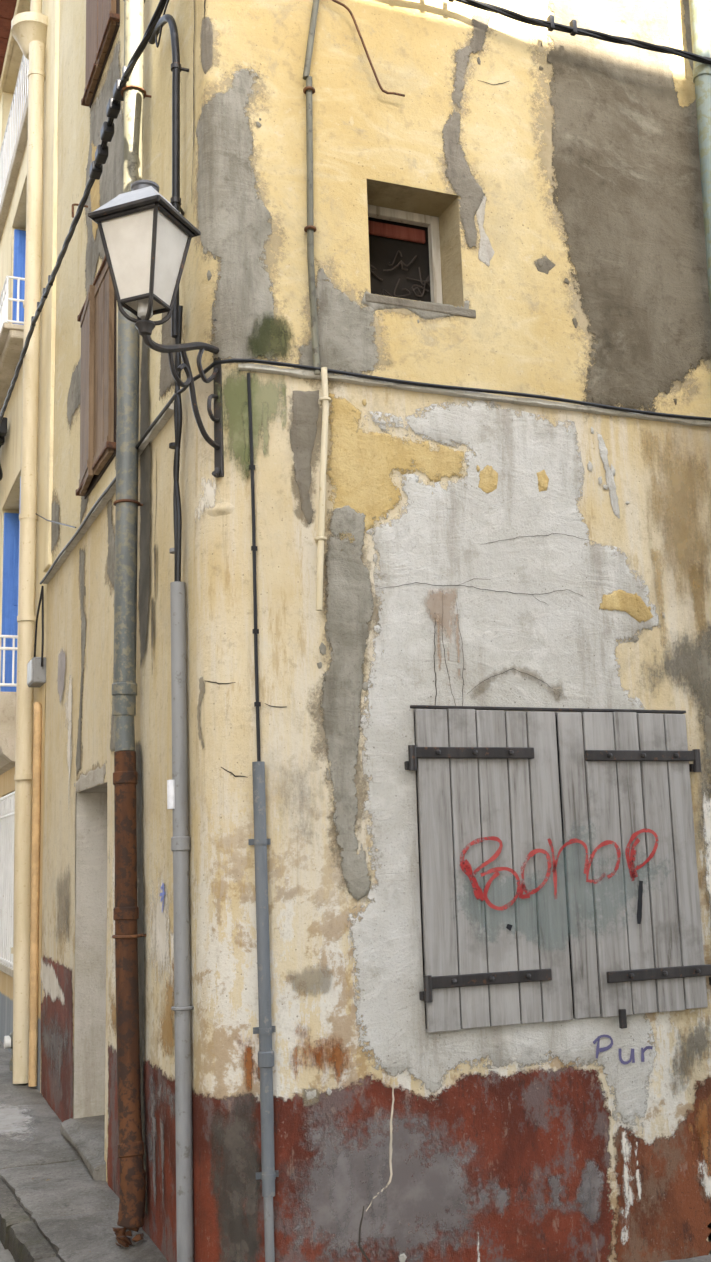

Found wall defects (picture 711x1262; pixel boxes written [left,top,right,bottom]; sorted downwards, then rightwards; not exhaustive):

peeling [86,140,100,240]
peeling [531,0,711,412]
damp [242,384,287,477]
peeling [326,393,498,564]
peeling [537,470,549,492]
peeling [599,589,665,623]
damp [642,437,711,908]
damp [673,1024,709,1088]
damp [699,1161,711,1196]